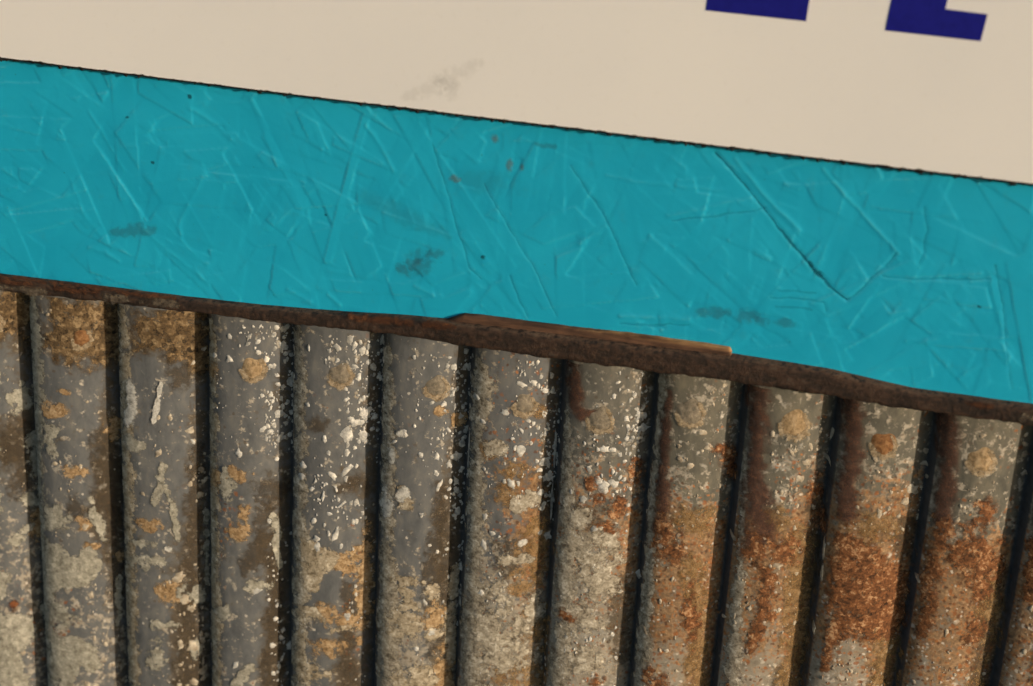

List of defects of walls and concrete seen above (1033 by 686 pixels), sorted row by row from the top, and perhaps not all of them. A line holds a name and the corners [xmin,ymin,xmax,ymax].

corrosion [0,275,177,300]
damp [0,291,214,388]
corrosion [348,313,456,329]
damp [67,429,125,599]
damp [172,441,210,686]
damp [239,478,292,686]
damp [338,582,360,686]
damp [422,482,453,685]
damp [539,479,558,530]
corrosion [641,664,670,686]
corrosion [648,390,723,686]
corrosion [712,384,1006,686]